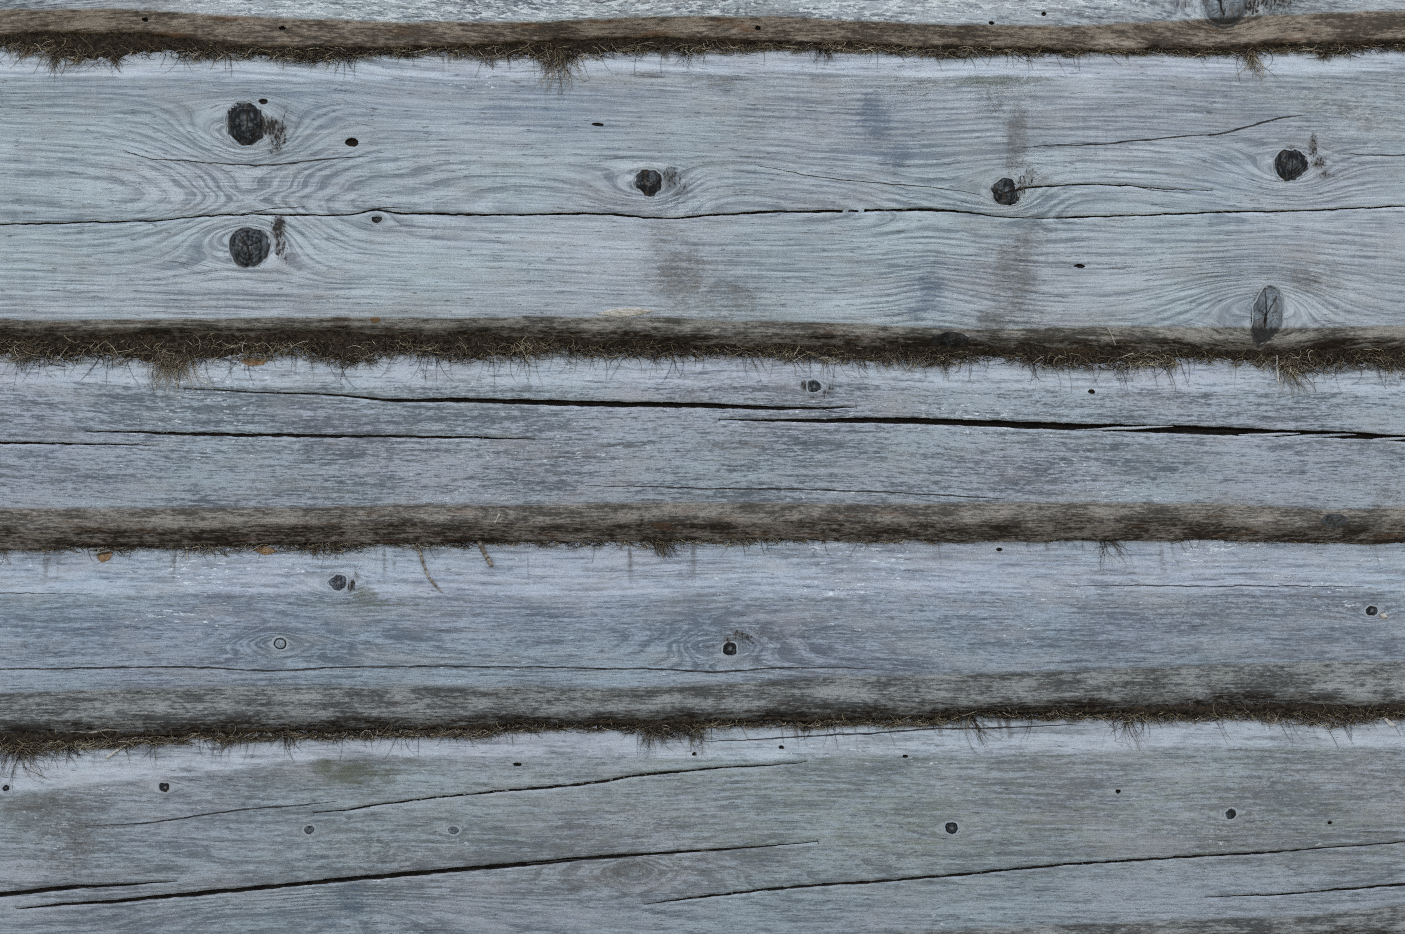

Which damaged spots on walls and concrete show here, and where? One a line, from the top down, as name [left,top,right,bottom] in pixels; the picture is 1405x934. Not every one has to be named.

crack [124,150,364,167]
crack [1023,115,1303,148]
crack [1349,150,1405,158]
crack [0,166,1405,230]
crack [0,385,1405,466]
crack [94,724,1075,826]
crack [0,837,1405,914]